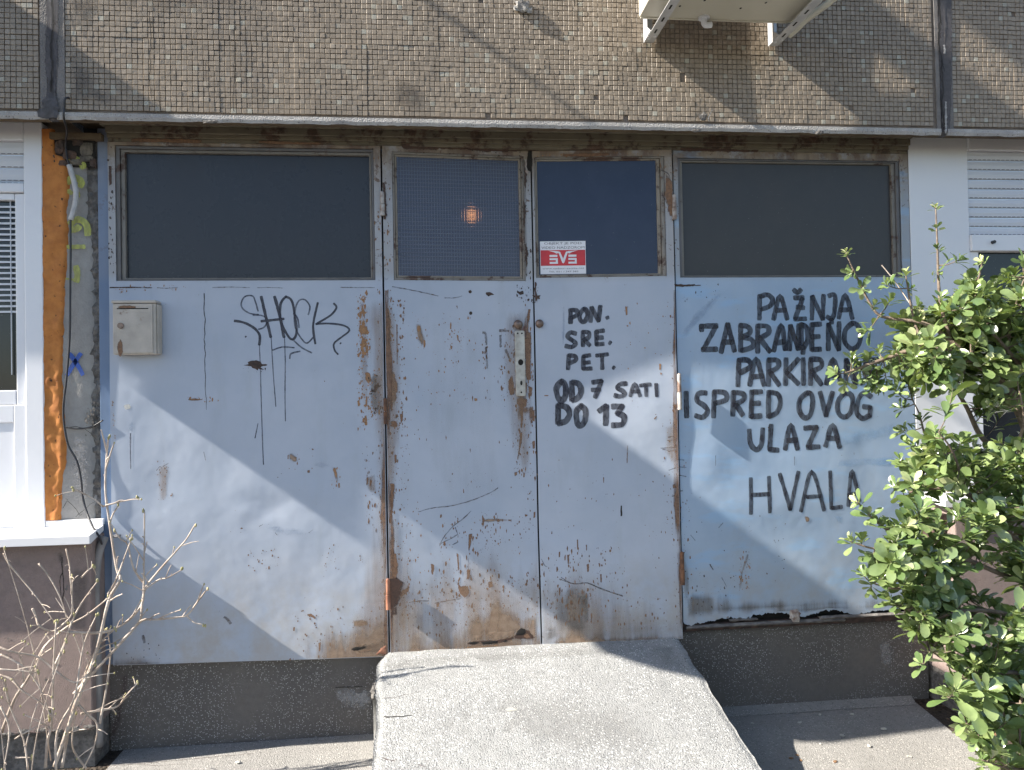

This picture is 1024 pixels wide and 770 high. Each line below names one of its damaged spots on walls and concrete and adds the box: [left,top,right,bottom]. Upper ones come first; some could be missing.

corrosion [110,284,186,308]
corrosion [293,284,755,658]